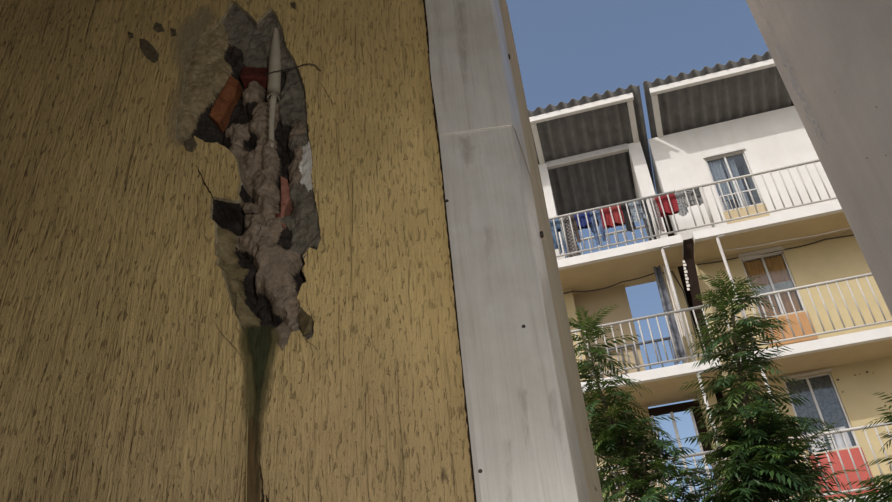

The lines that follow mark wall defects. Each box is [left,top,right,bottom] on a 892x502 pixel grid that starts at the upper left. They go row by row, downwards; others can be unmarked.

spalling [175,0,321,350]
water stain [240,325,279,502]
crack [260,465,269,502]